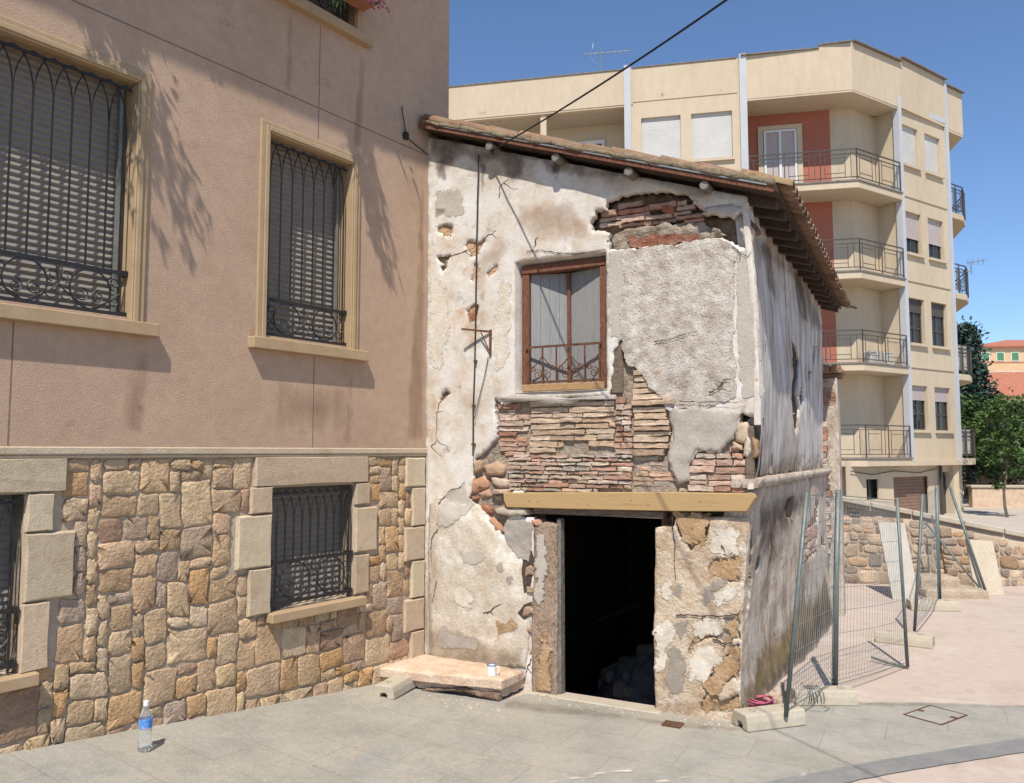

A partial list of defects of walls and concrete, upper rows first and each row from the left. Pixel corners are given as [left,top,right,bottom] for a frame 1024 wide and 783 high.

flaking render [438,225,453,237]
flaking render [466,240,498,281]
flaking render [471,193,764,536]
flaking render [672,511,713,550]
spalling [518,551,534,619]
leakage [747,579,832,703]